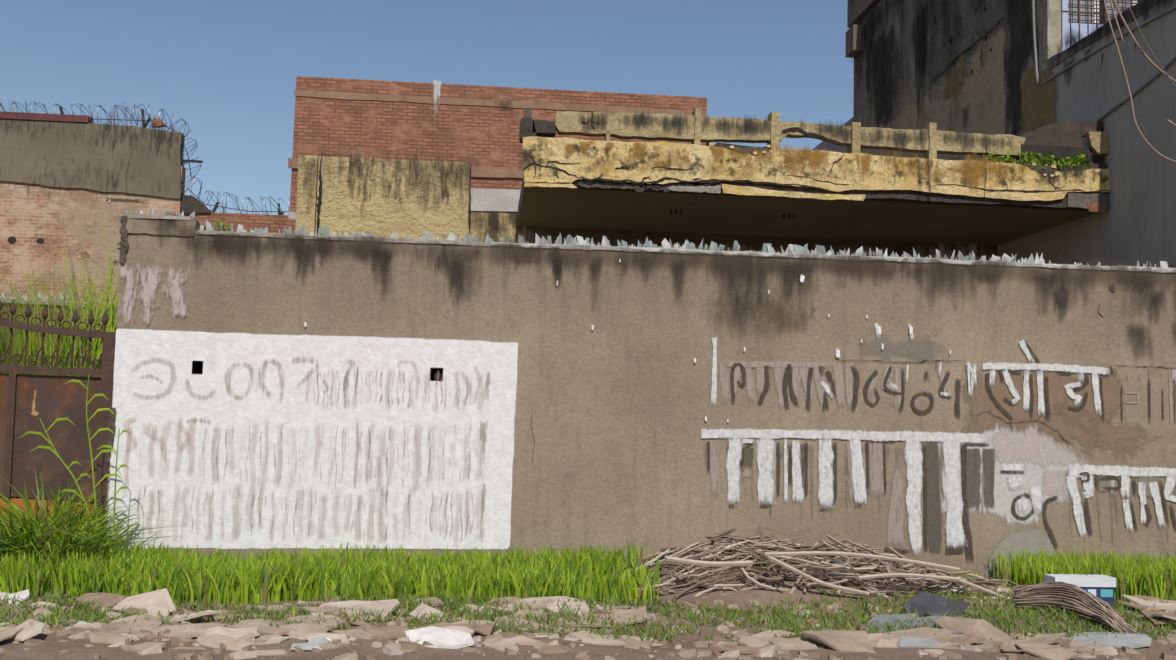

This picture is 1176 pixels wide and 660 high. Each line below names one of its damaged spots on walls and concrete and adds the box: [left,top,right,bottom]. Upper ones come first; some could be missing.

leakage [854,0,958,148]
leakage [944,0,1037,148]
leakage [819,125,852,141]
crack [315,157,323,235]
leakage [524,143,672,177]
crack [523,127,850,190]
leakage [690,152,744,174]
leakage [893,160,1109,190]
leakage [714,250,819,322]
leakage [932,252,1005,288]
leakage [1039,268,1104,313]
leakage [1120,271,1176,307]